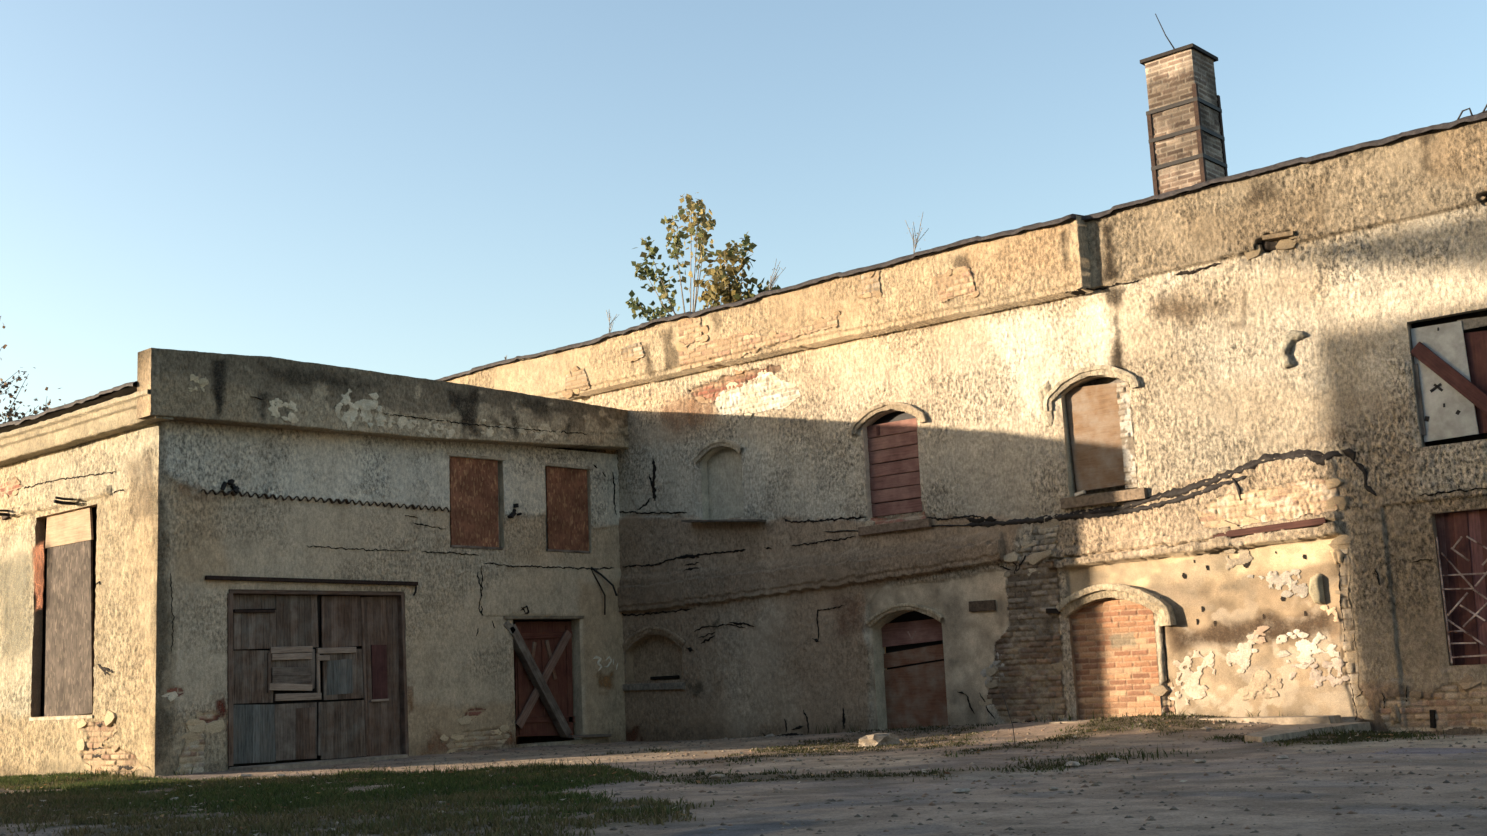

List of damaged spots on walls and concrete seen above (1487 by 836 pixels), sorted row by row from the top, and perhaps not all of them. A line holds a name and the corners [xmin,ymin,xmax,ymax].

spalling [858,271,882,299]
leakage [449,390,479,431]
spalling [676,311,841,419]
crack [384,413,687,515]
crack [308,515,865,636]
crack [622,608,755,652]
crack [812,605,843,642]
spalling [979,517,1072,724]
spalling [1149,478,1487,732]
spalling [76,710,151,776]